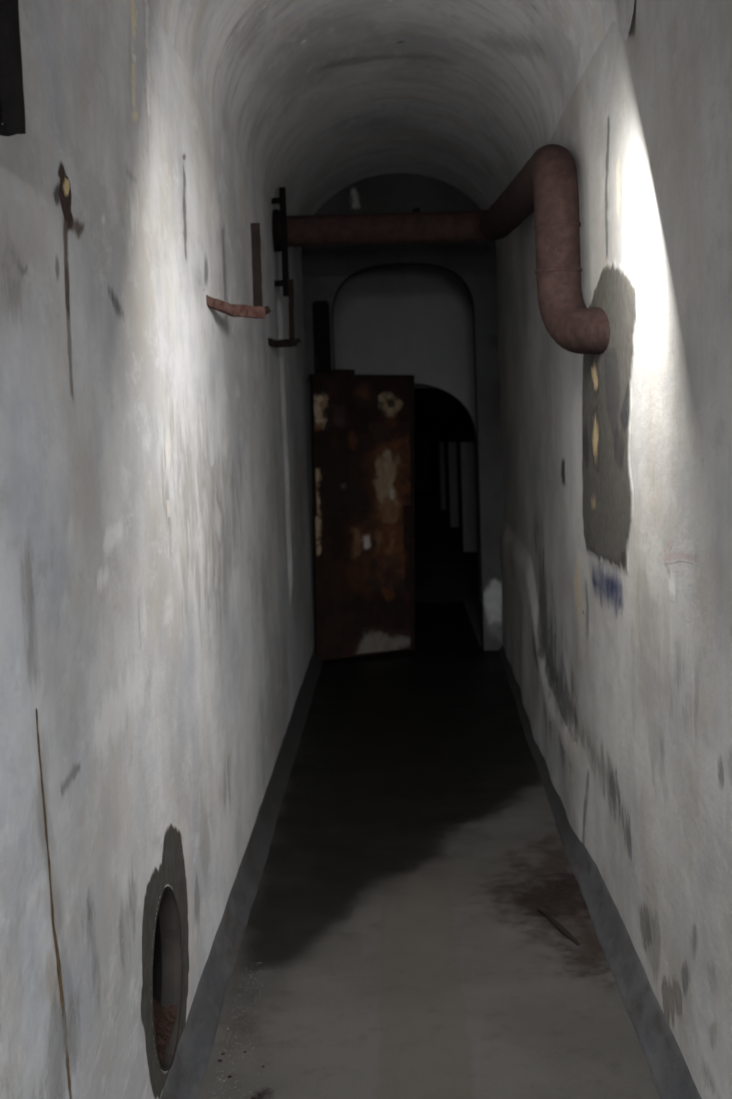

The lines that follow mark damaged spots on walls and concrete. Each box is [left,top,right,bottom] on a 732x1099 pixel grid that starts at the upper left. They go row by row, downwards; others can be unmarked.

rust [54,155,83,314]
rust [348,421,410,593]
peeling [582,255,639,579]
crack [36,709,71,1089]
peeling [140,818,190,1099]
water stain [224,601,548,1000]